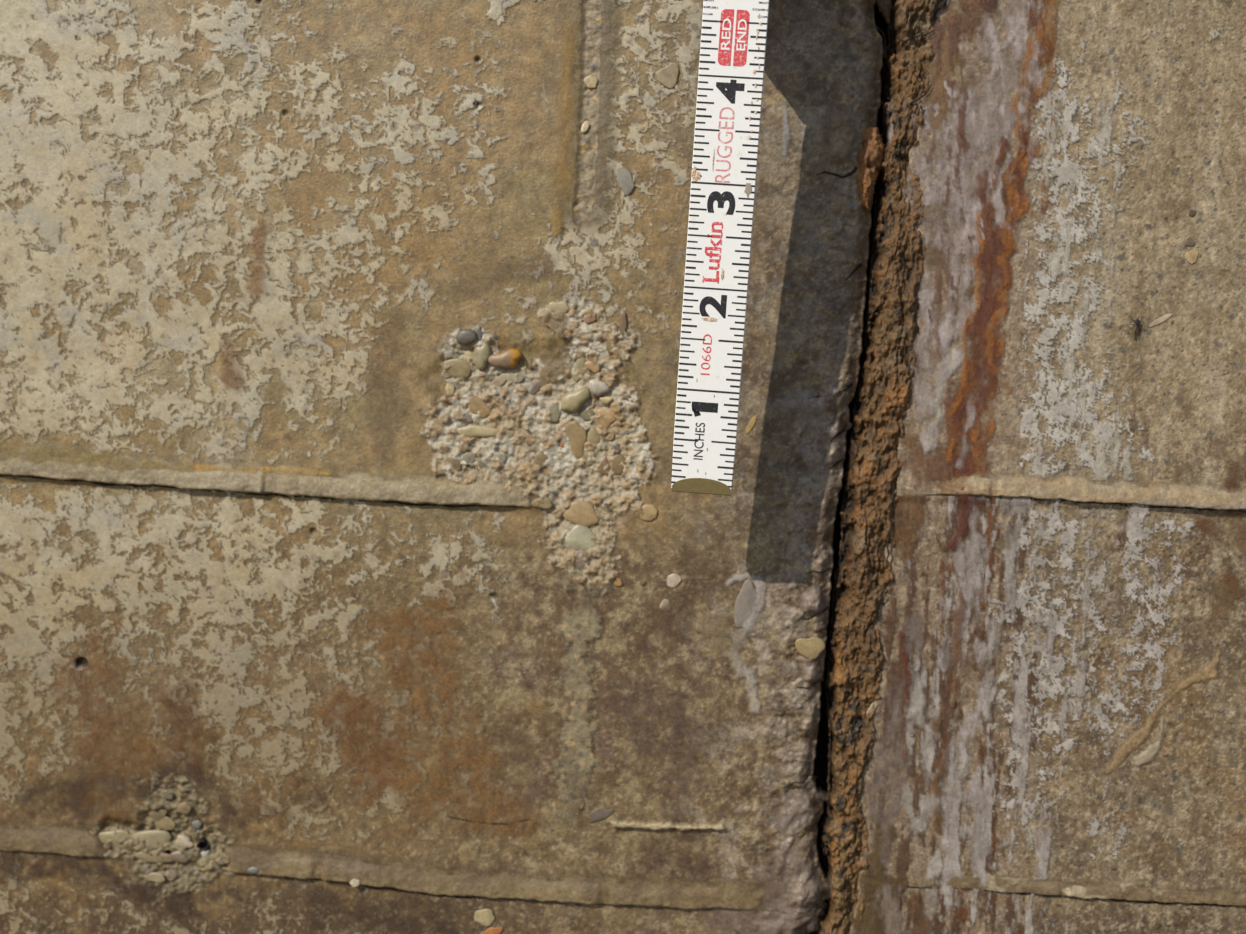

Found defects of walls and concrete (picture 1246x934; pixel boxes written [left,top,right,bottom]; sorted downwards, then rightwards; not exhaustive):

crack [874,3,931,143]
crack [932,0,947,25]
damp [899,0,1155,480]
crack [0,475,513,508]
peeling [0,0,703,934]
crack [753,166,910,934]
corrosion [930,0,1059,832]
crack [996,497,1246,513]
damp [849,495,1198,934]
corrosion [984,812,997,876]
corrosion [910,895,971,934]